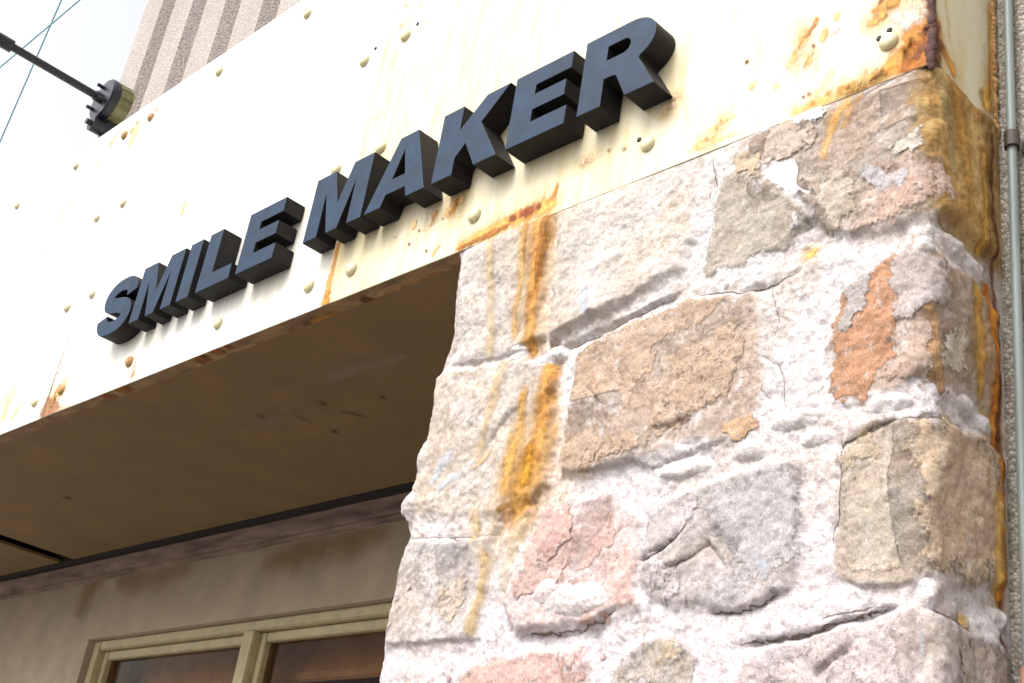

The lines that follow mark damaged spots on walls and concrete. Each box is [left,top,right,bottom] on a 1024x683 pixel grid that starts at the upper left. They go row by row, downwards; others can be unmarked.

peeling [703,68,960,277]
corrosion [39,337,73,419]
corrosion [295,242,340,331]
corrosion [457,184,558,358]
corrosion [496,363,561,542]
corrosion [786,0,1007,610]
corrosion [466,514,489,633]